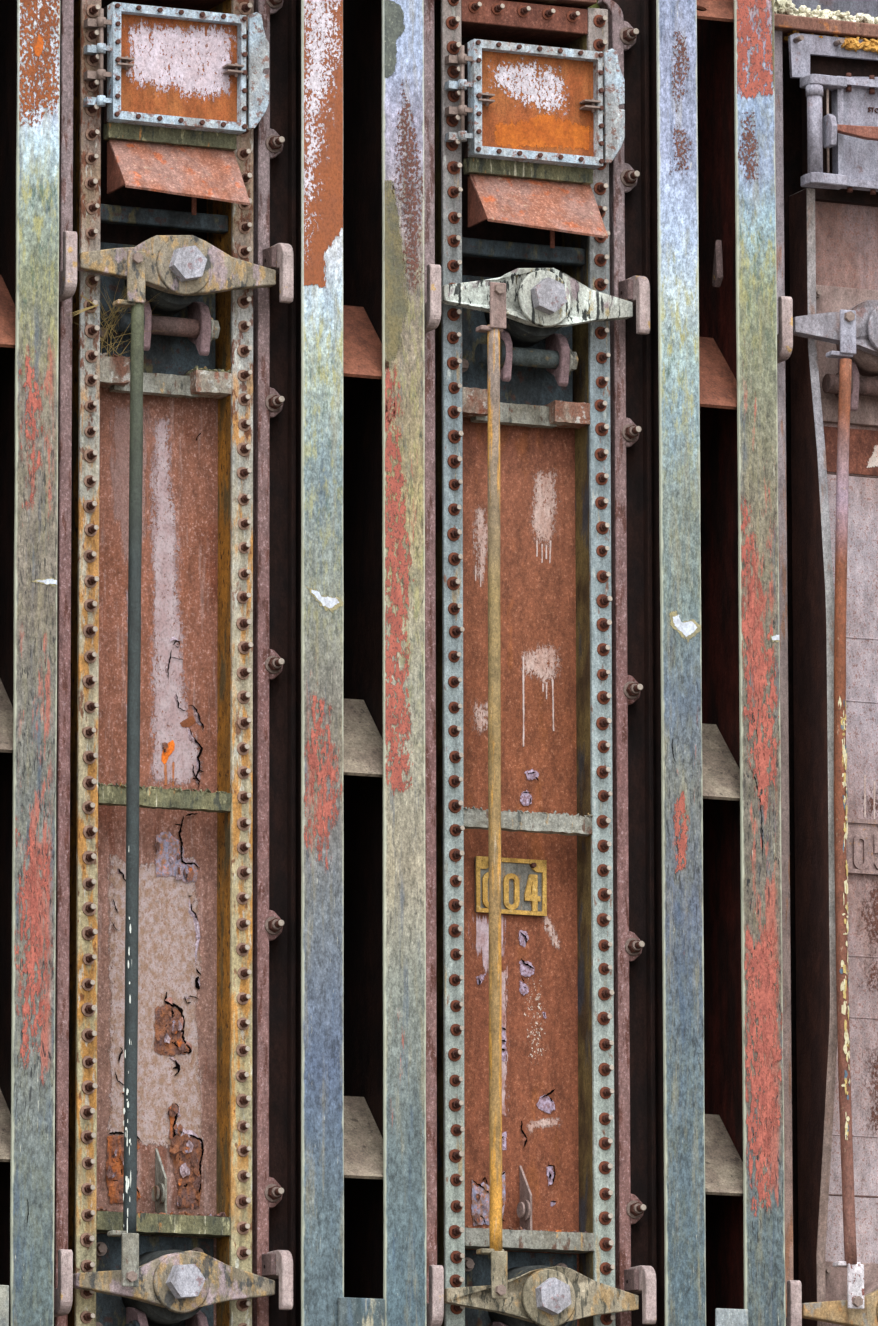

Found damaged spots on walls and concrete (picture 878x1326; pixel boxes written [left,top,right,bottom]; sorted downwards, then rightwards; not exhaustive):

rust [494,113,592,150]
water stain [536,540,551,563]
peeling [741,496,780,811]
water stain [542,679,554,731]
peeling [304,682,342,870]
spalling [518,930,535,995]
spalling [536,1089,555,1114]
spalling [546,1164,557,1207]